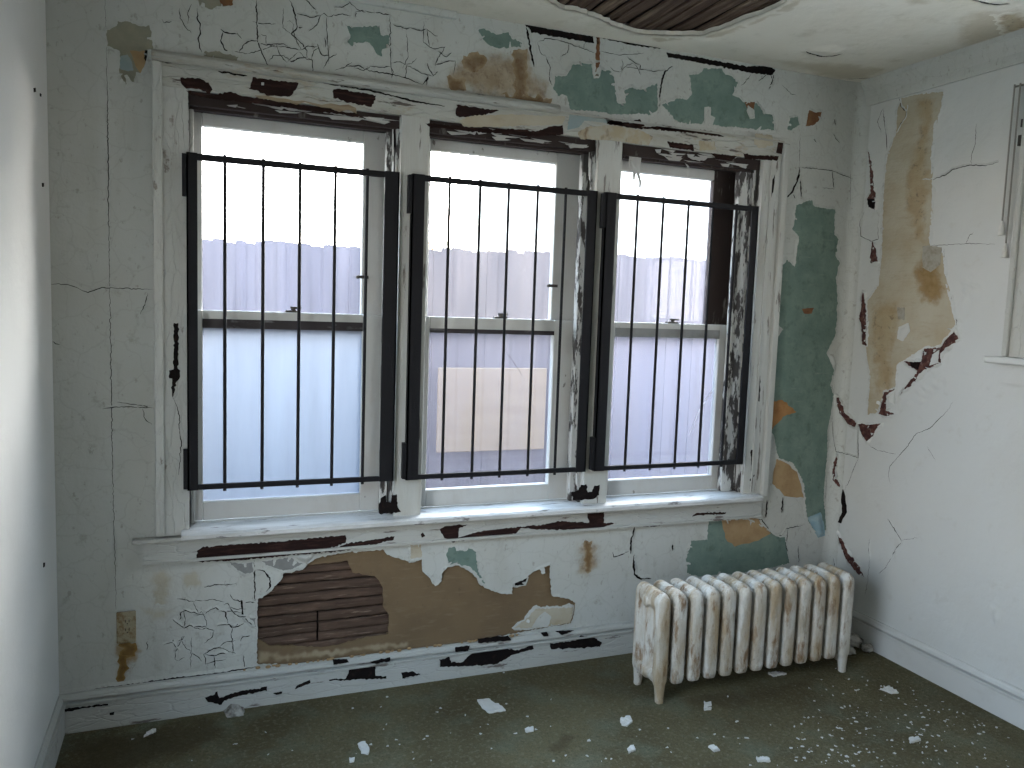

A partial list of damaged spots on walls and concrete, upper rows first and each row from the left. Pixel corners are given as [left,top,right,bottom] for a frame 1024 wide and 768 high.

crack [162,0,456,106]
damp [419,43,557,104]
spalling [589,0,687,23]
peeling [180,77,397,171]
peeling [427,36,823,206]
peeling [771,88,961,578]
crack [825,410,948,493]
peeling [683,512,791,579]
crack [146,560,274,668]
spalling [196,512,614,681]
peeling [65,704,114,715]
peeling [205,686,282,705]